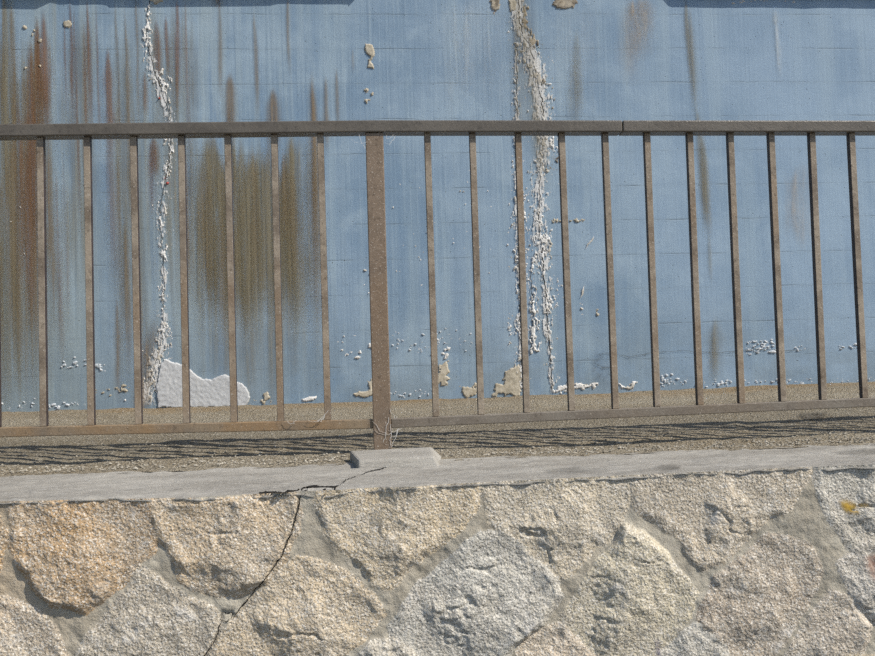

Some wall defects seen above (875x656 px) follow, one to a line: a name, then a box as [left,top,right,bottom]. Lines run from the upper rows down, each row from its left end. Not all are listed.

corrosion [31,25,48,124]
peeling [156,359,272,408]
peeling [491,364,522,397]
crack [204,467,385,656]